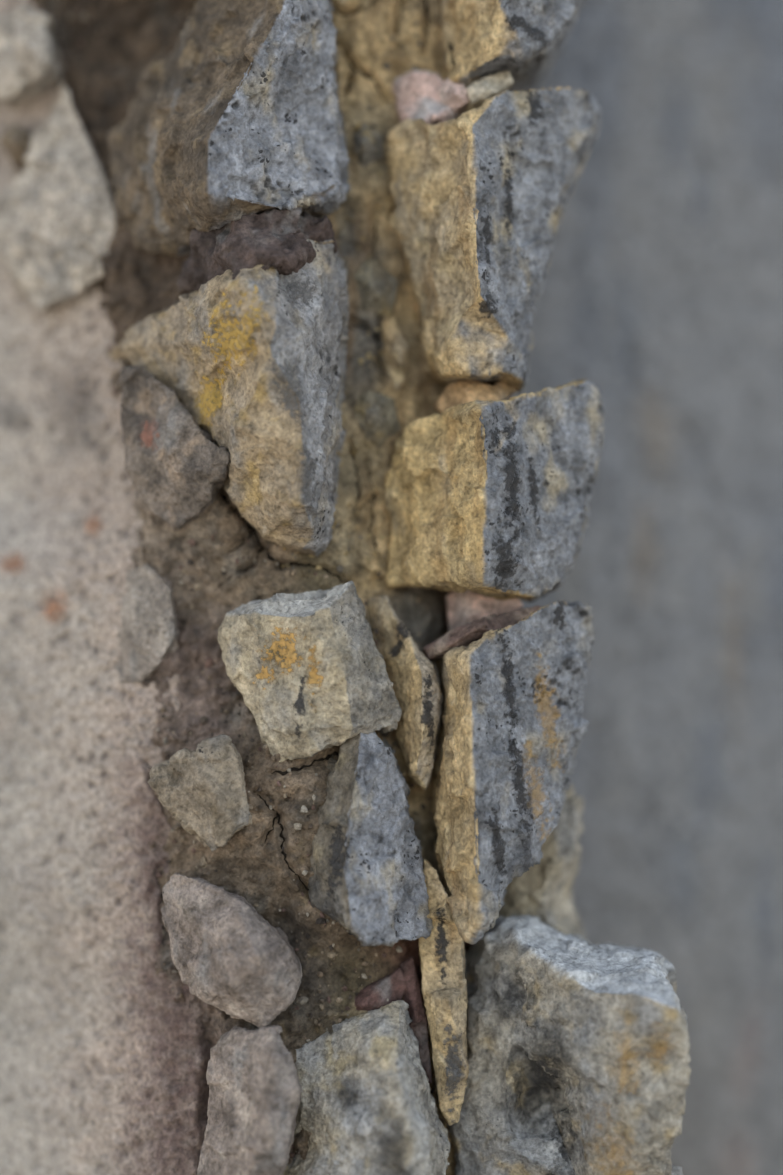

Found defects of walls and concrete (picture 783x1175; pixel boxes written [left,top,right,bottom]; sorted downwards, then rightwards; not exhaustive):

crack [340,47,386,102]
crack [332,0,457,74]
crack [349,316,383,382]
crack [221,489,345,584]
crack [349,446,380,559]
crack [258,752,339,890]